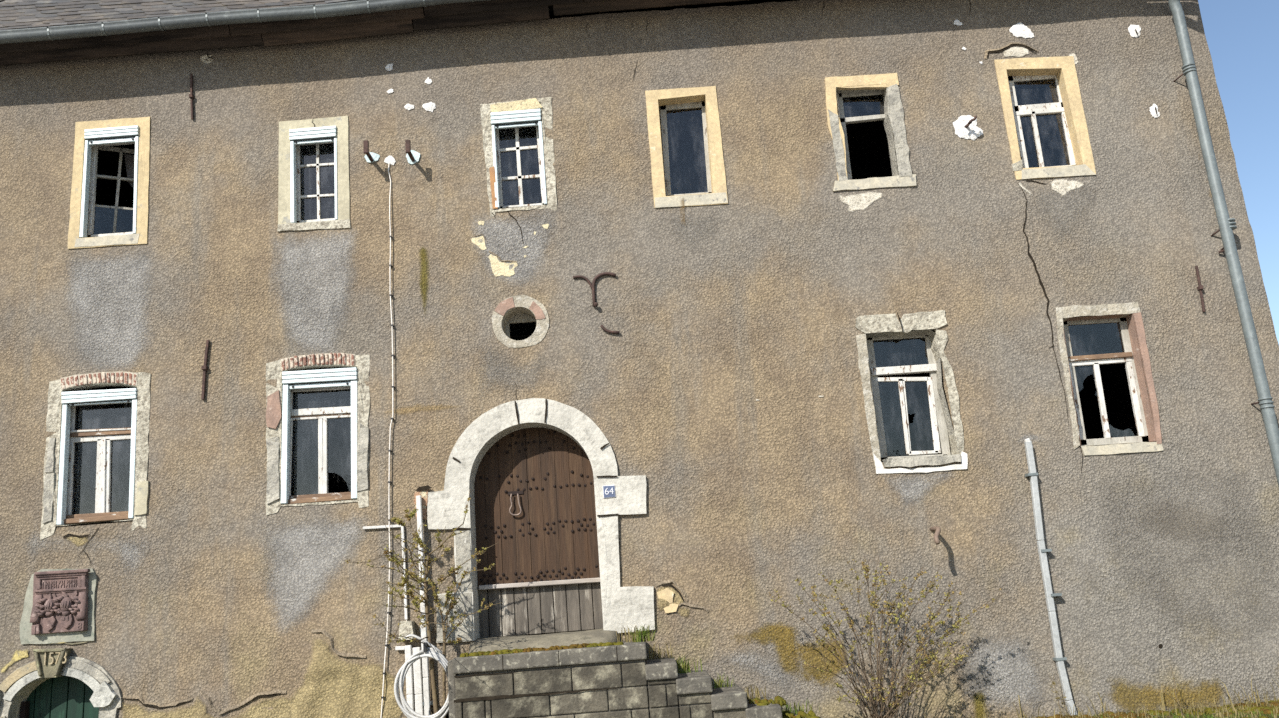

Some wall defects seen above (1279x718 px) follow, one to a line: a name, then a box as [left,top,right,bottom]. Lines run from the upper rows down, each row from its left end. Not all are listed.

flaking render [984,42,1038,59]
flaking render [839,192,882,212]
flaking render [1051,179,1084,196]
flaking render [471,221,549,277]
damp [73,259,146,366]
damp [280,237,350,347]
crack [1017,180,1083,473]
flaking render [655,579,709,616]